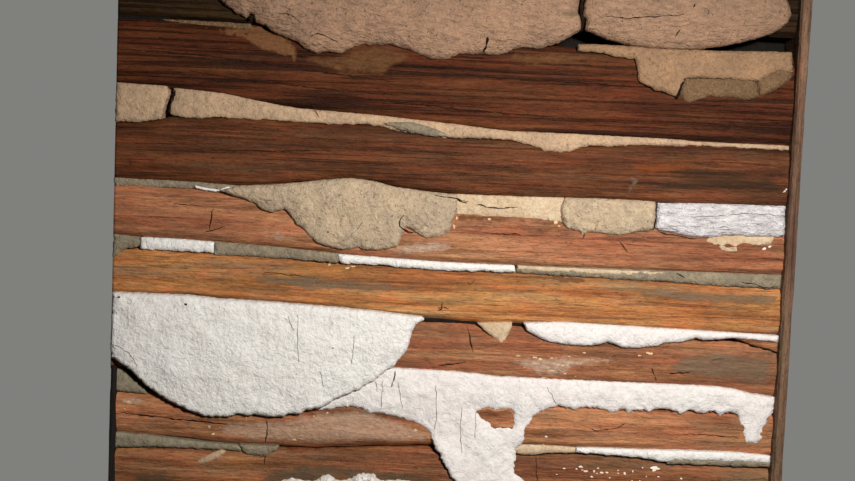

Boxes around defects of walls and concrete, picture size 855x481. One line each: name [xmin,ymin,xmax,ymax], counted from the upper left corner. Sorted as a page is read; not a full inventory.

peeling [220,0,793,103]
crack [578,0,586,31]
crack [606,4,695,37]
peeling [221,178,458,250]
peeling [554,197,786,251]
peeling [110,291,779,481]